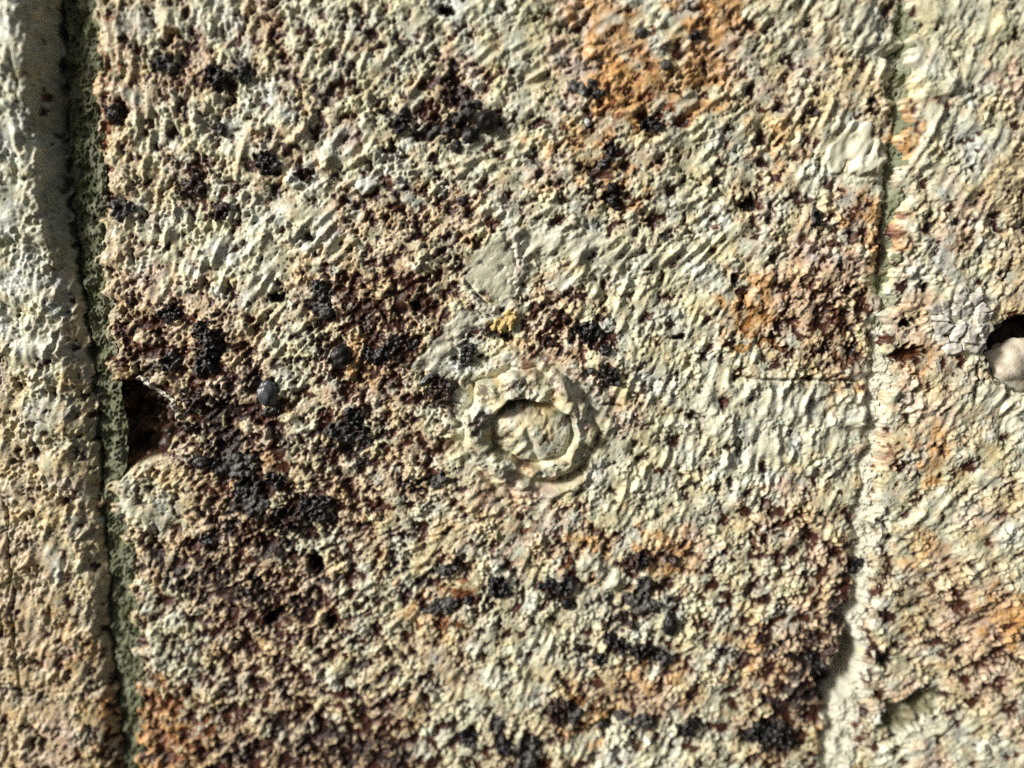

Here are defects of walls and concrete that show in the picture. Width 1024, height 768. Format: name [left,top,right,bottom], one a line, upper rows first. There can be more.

spalling [121,375,179,474]